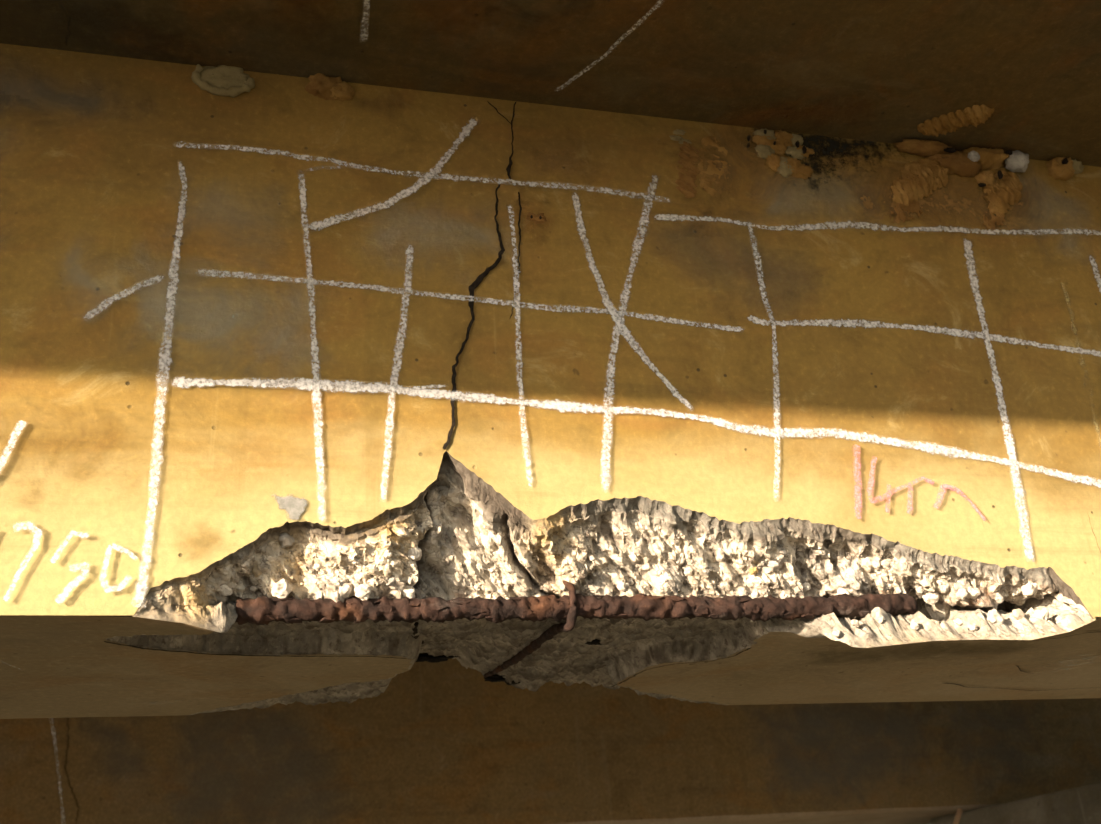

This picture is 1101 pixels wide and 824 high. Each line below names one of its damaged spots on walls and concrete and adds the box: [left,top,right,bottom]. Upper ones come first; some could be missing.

crack [443,102,522,450]
spalling [106,451,1095,715]